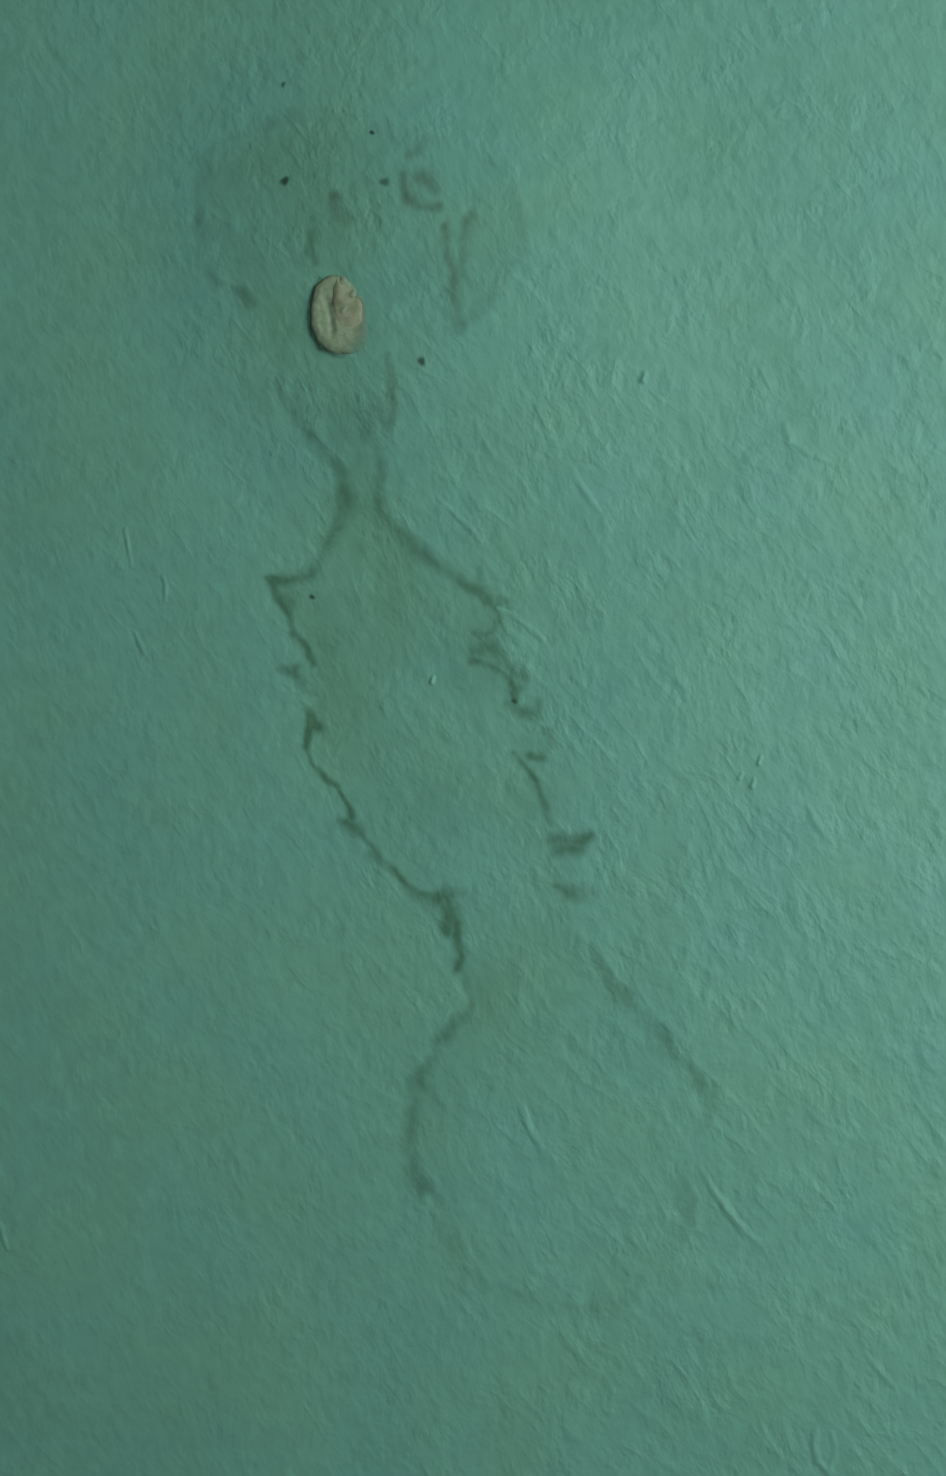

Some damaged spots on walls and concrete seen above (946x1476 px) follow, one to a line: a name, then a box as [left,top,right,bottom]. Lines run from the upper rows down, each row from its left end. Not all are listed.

water stain [305,713,321,748]